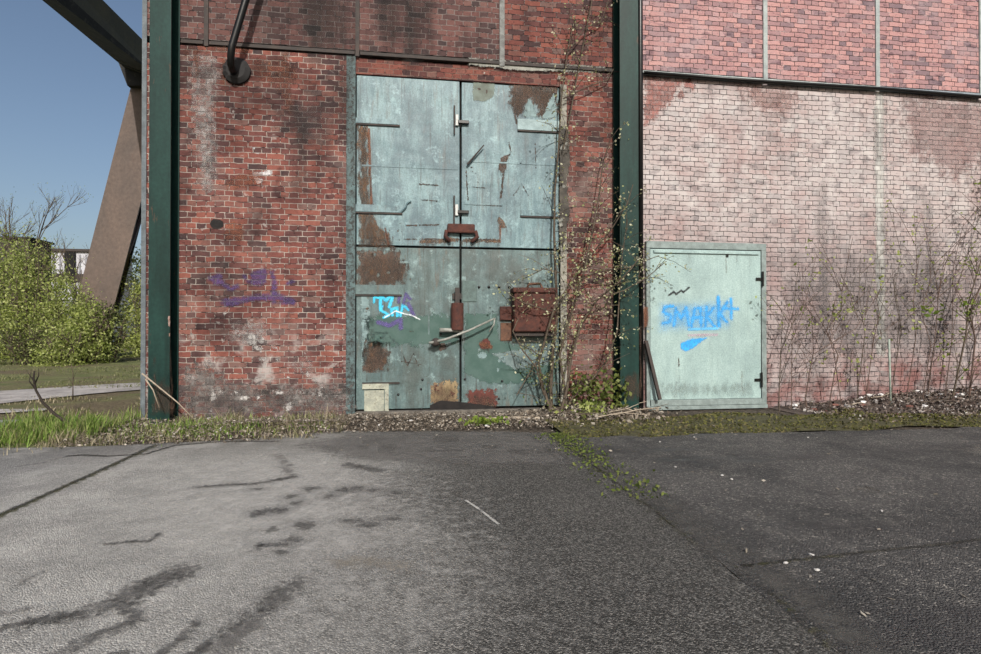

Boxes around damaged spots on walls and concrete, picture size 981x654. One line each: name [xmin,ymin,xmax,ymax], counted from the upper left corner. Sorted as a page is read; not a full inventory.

peeling [472,59,495,102]
rust [356,125,394,248]
peeling [484,142,528,241]
peeling [508,76,571,259]
rust [430,378,498,410]